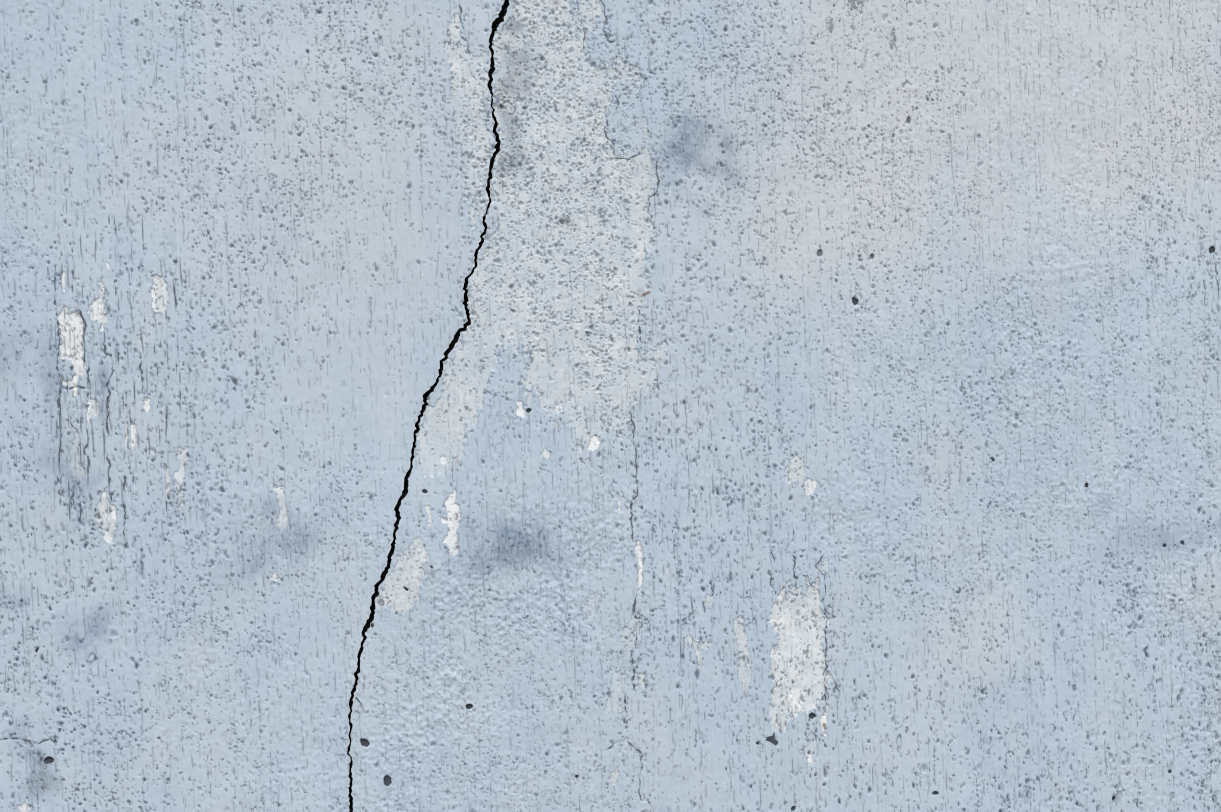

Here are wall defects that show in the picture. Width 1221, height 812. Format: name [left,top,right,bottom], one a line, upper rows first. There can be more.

crack [583,0,614,49]
spalling [150,273,169,314]
peeling [416,0,671,479]
peeling [57,271,109,482]
crack [341,0,512,812]
peeling [377,488,462,614]
spalling [633,541,643,587]
peeling [768,557,833,764]
crack [1,736,55,744]